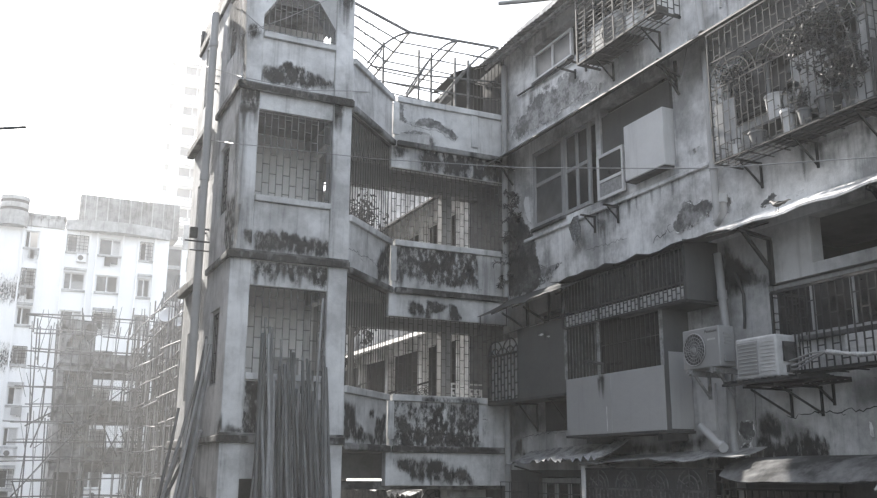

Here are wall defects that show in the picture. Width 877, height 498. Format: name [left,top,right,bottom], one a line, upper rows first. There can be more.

water stain [223,0,352,287]
peeling [509,70,602,142]
peeling [673,199,713,234]
water stain [377,244,504,321]
mould [330,397,500,485]
crack [786,406,877,419]